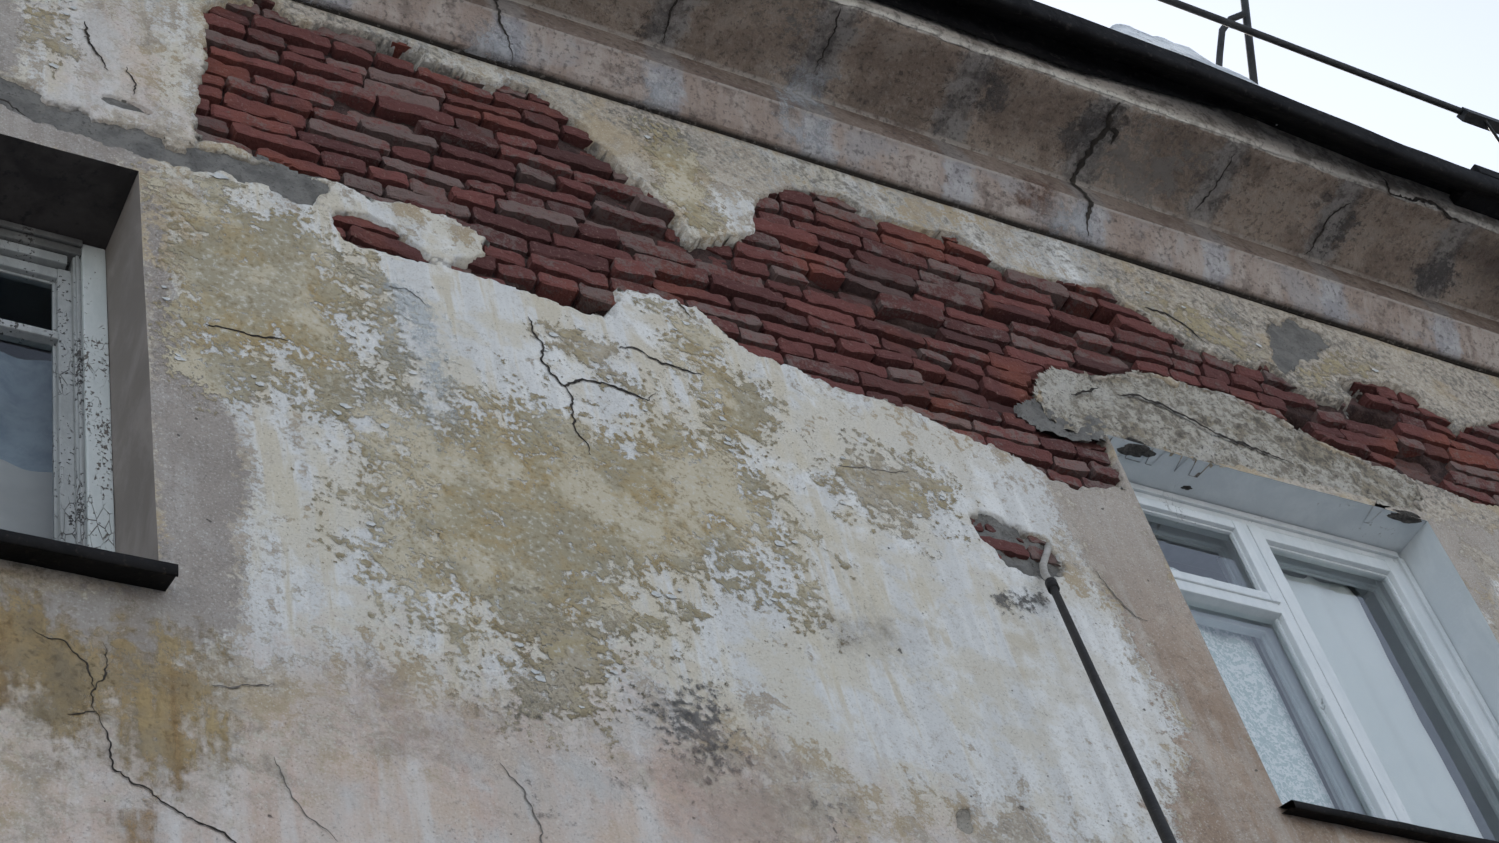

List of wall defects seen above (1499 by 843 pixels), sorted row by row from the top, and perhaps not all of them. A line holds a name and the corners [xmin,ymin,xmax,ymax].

crack [493,0,513,60]
spalling [101,97,150,115]
peeling [626,109,729,235]
crack [1069,102,1121,236]
spalling [332,215,429,263]
crack [528,317,701,454]
spalling [1129,286,1386,391]
peeling [796,424,1061,580]
spalling [1387,509,1422,524]
crack [32,629,237,843]
crack [274,757,337,841]
crack [500,763,543,843]